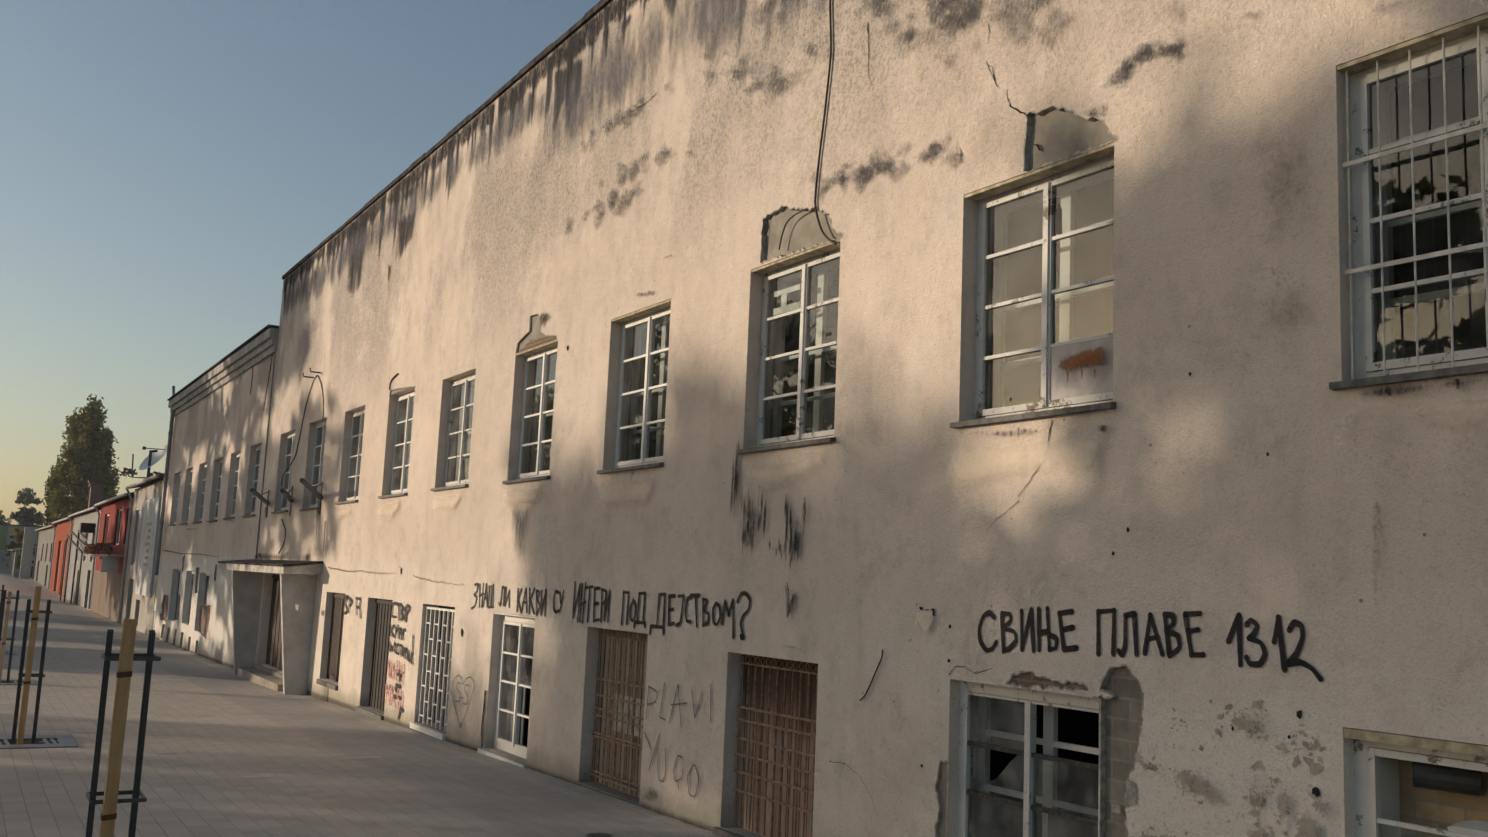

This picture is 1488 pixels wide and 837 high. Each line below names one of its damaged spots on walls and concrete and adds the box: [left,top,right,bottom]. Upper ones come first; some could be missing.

leakage [283,0,744,312]
flaking render [760,205,843,264]
crack [986,24,1026,115]
flaking render [1023,106,1118,173]
leakage [730,445,820,617]
flaking render [1005,663,1330,837]